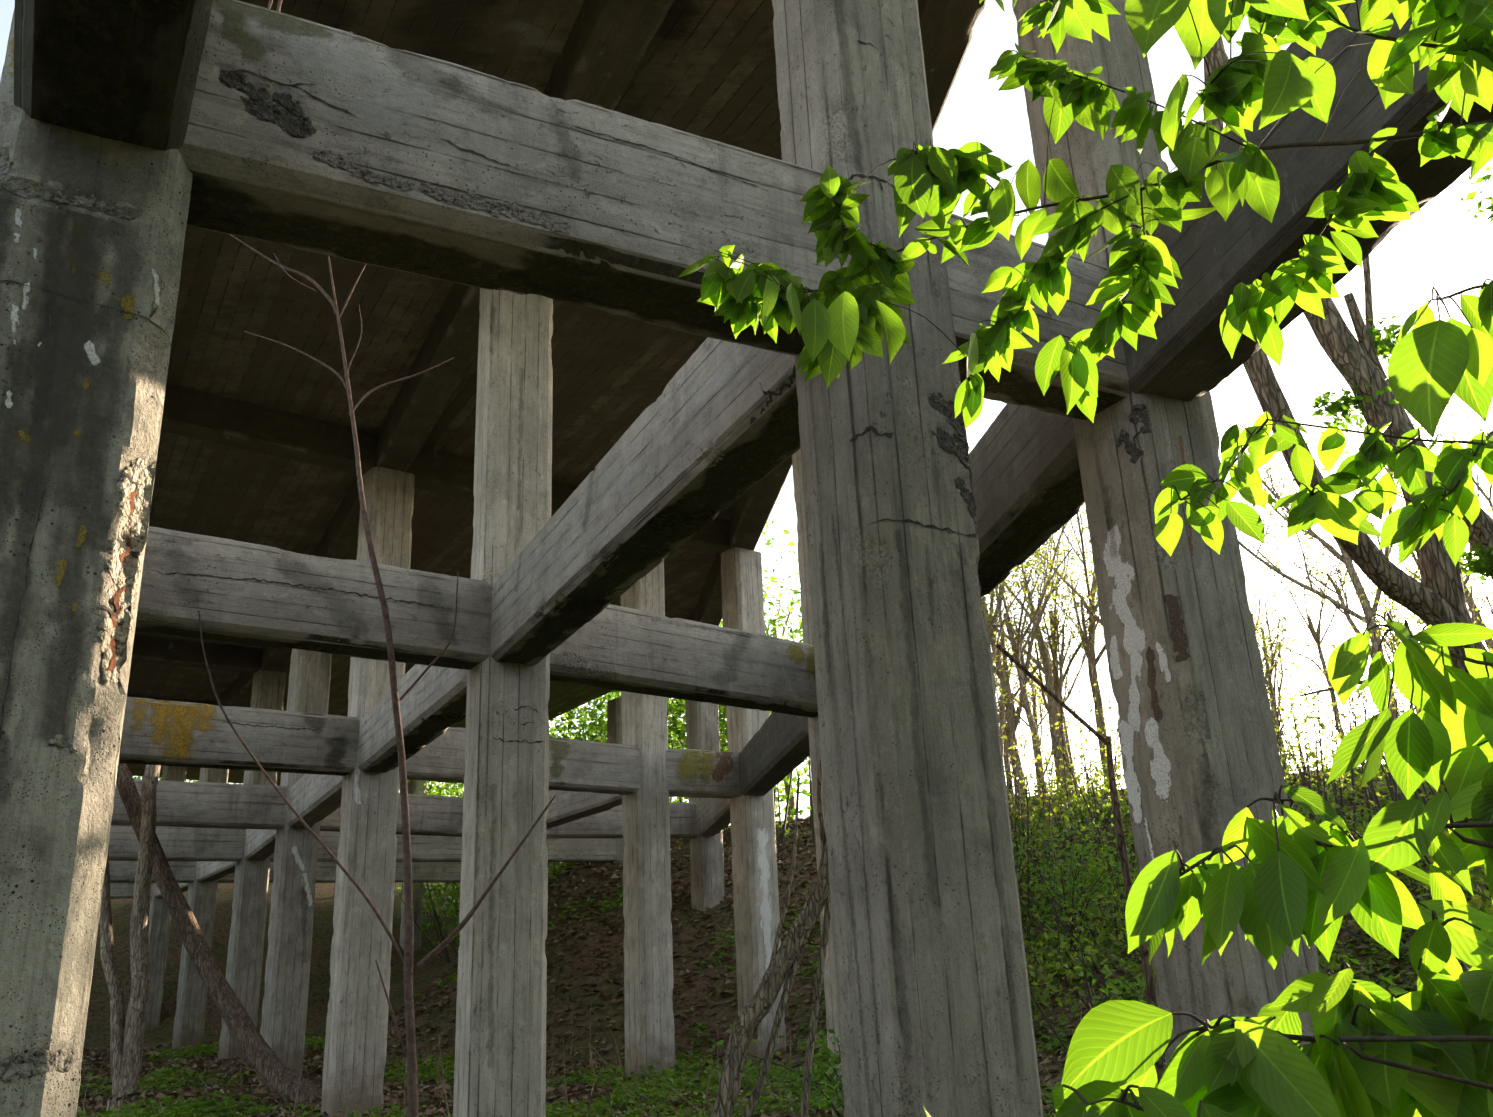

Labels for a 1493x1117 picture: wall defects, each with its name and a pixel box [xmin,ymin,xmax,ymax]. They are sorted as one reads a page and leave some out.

spalling [219,70,570,234]
crack [0,466,51,738]
damp [0,0,187,798]
rust [107,489,138,671]
spalling [97,453,152,686]
crack [849,425,894,442]
crack [867,518,980,546]
peeling [1103,524,1190,860]